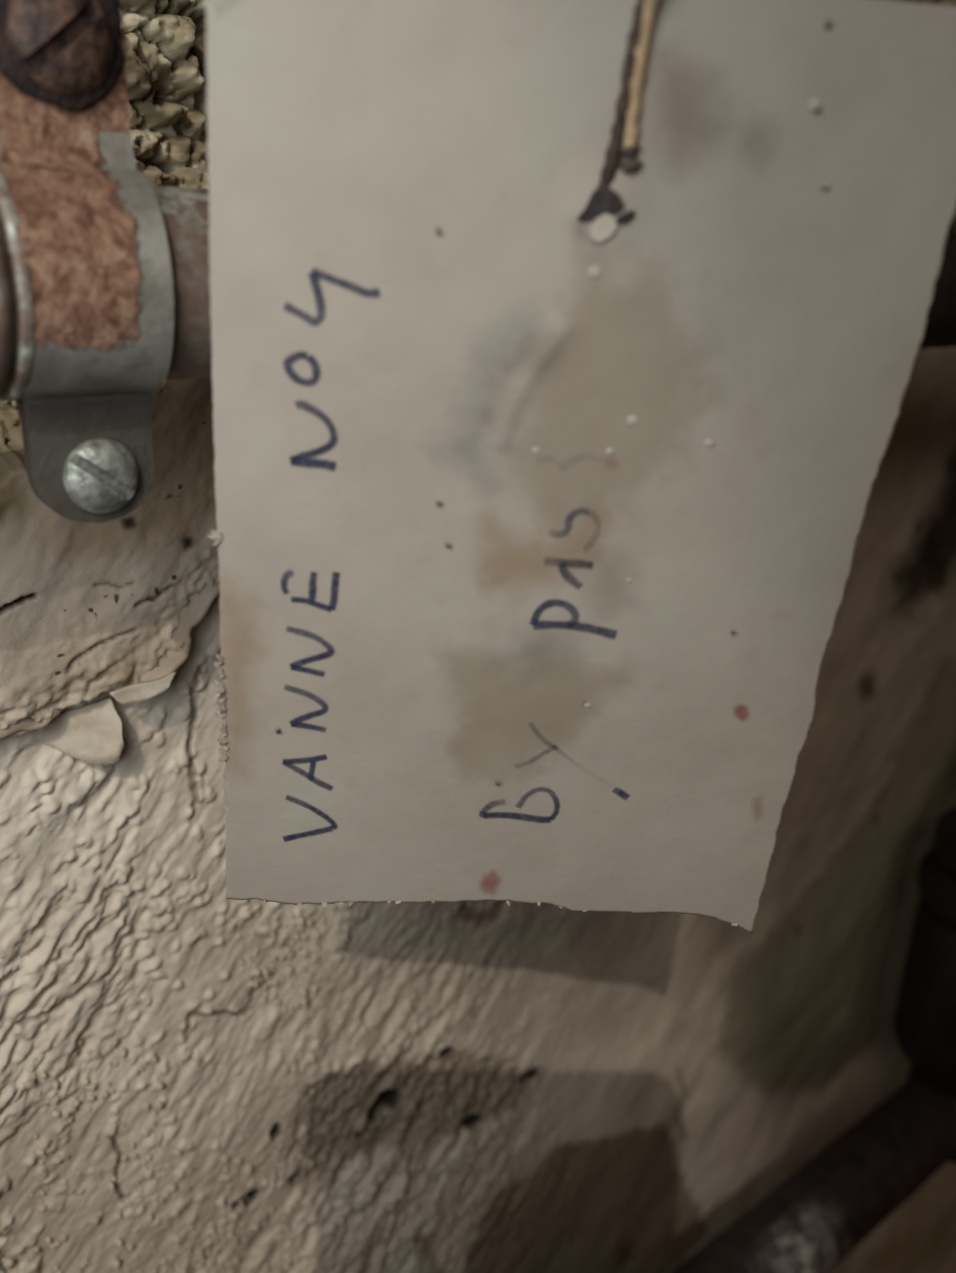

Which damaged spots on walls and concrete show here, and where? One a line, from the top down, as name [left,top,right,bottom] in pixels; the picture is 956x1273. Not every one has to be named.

crack [0,594,35,612]
flaking render [0,582,220,766]
water stain [897,452,956,603]